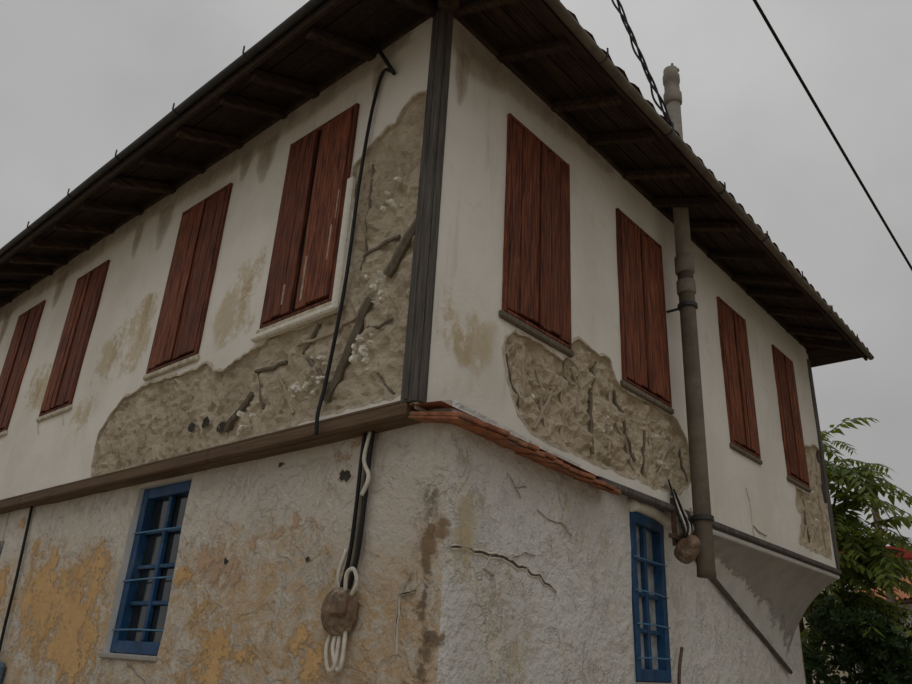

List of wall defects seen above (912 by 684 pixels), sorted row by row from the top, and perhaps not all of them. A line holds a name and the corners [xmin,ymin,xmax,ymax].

flaking render [91,90,427,477]
flaking render [502,329,691,496]
crack [507,473,572,536]
flaking render [795,444,832,560]
crack [450,543,557,594]
peeling [713,535,838,650]